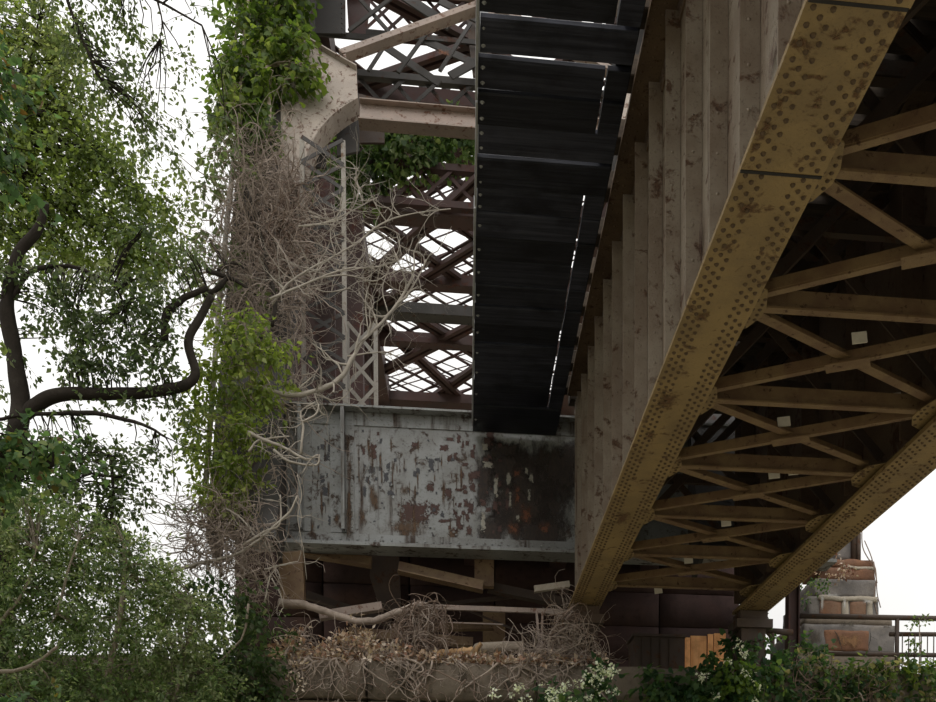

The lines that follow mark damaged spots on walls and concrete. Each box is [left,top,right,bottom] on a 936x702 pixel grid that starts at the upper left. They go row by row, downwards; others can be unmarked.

peeling [317,440,331,529]
rust [311,439,425,536]
peeling [356,430,520,537]
rust [434,441,575,542]